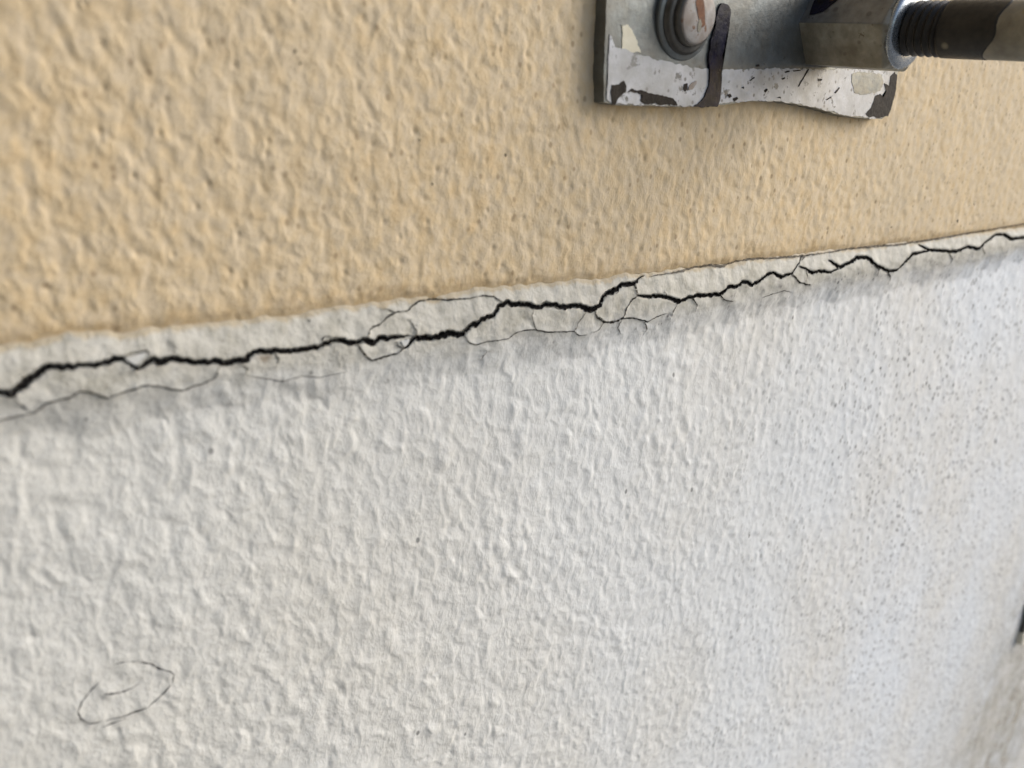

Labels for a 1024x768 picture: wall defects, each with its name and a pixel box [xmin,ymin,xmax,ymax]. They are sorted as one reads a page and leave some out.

crack [0,223,1024,421]